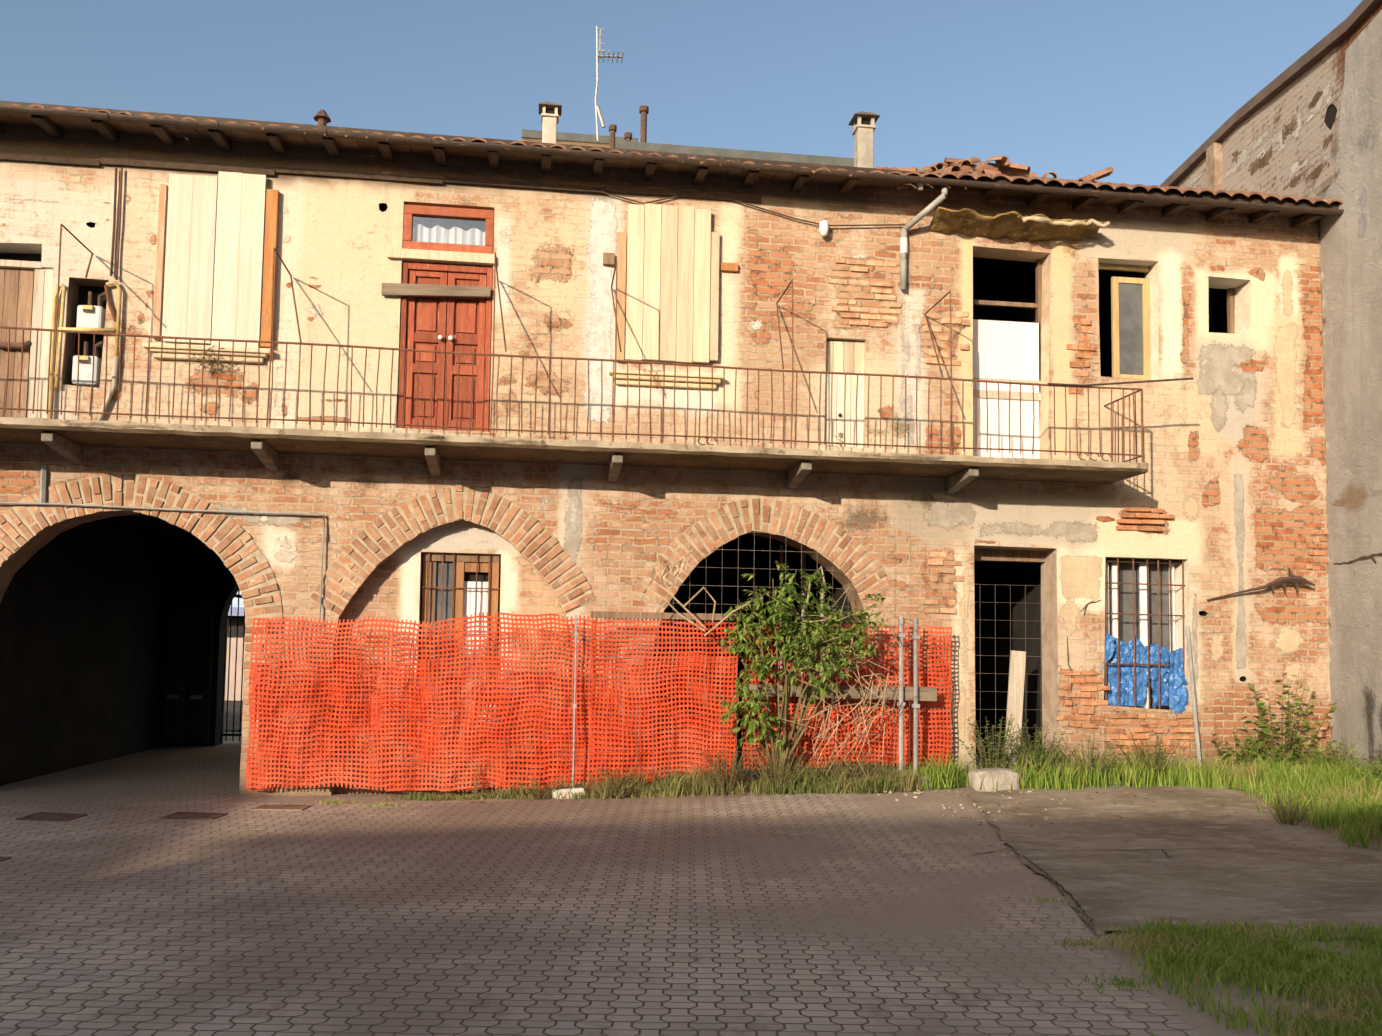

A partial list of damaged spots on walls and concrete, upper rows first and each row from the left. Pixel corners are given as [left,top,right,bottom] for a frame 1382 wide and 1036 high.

peeling [1224,81,1334,189]
peeling [498,198,618,424]
spalling [747,247,902,345]
spalling [919,309,970,366]
peeling [1180,286,1190,364]
peeling [1249,267,1266,281]
peeling [1162,360,1269,463]
peeling [1254,279,1328,572]
peeling [880,475,1220,744]
peeling [1254,603,1329,686]
spalling [1055,666,1202,758]